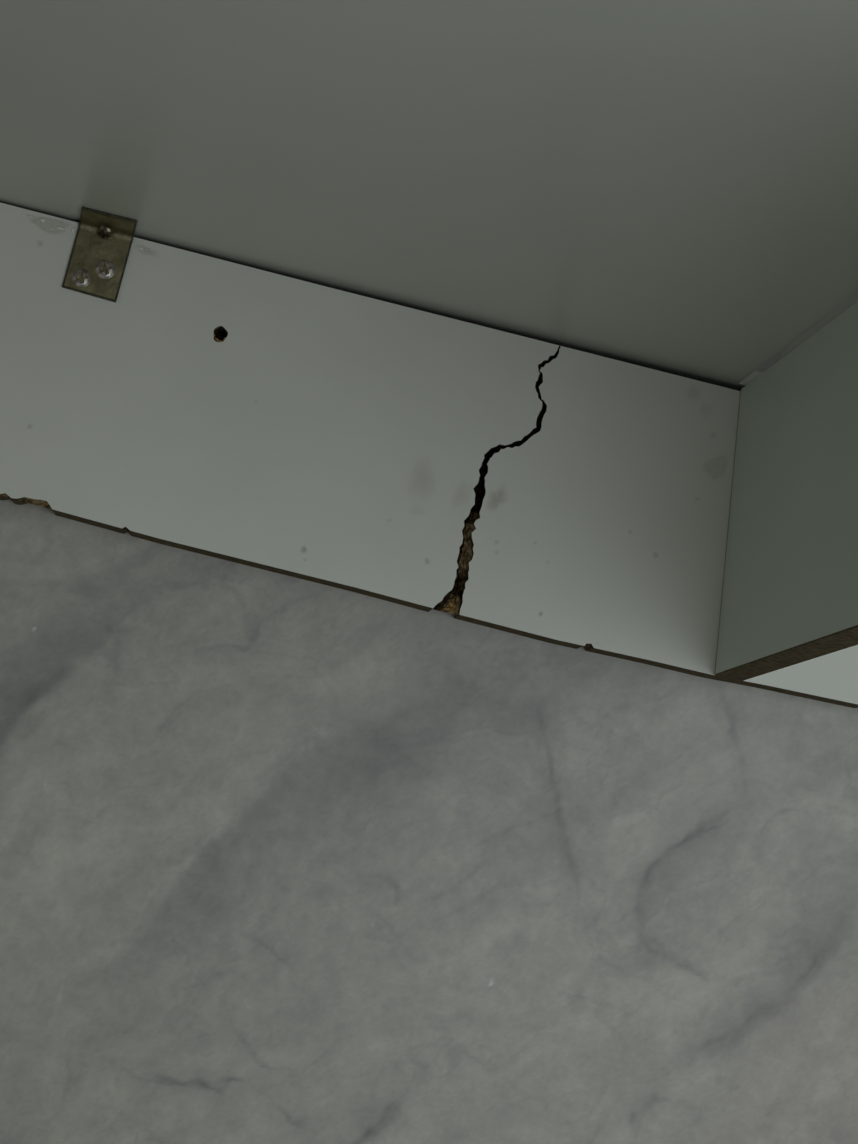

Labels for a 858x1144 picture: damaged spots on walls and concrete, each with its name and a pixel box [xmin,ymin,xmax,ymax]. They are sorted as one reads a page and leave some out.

crack [433,347,560,616]